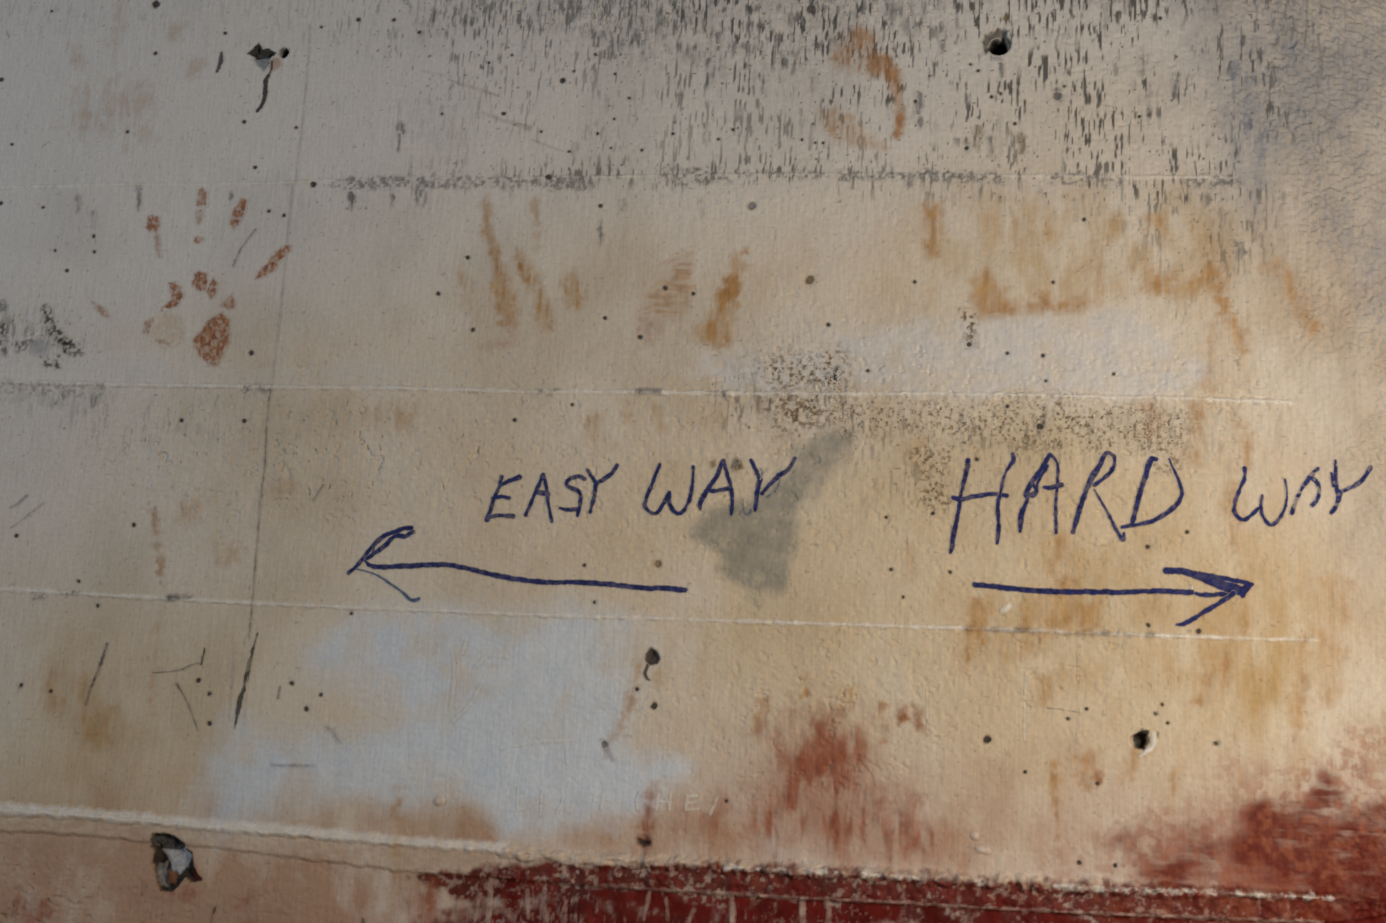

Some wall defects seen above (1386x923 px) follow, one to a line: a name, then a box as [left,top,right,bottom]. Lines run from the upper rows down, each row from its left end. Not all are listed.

rust [813,20,909,154]
spalling [149,831,204,894]